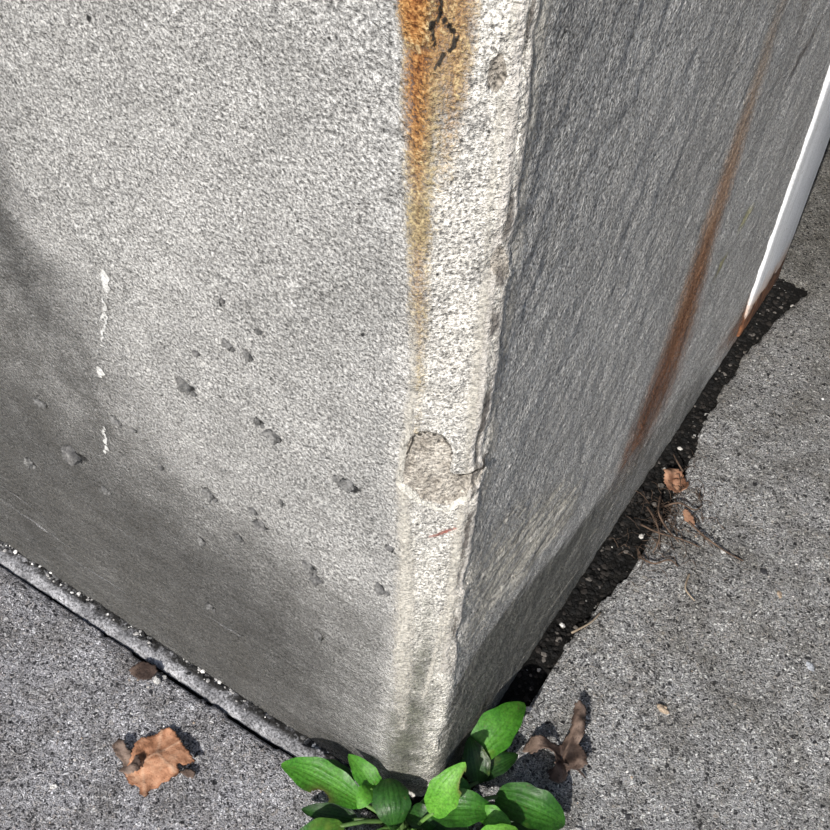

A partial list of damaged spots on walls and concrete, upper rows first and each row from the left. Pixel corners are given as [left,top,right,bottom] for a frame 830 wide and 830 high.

rust [396,0,478,345]
spalling [396,431,487,512]
crack [429,0,459,70]
crack [441,0,541,675]
rust [622,52,767,468]